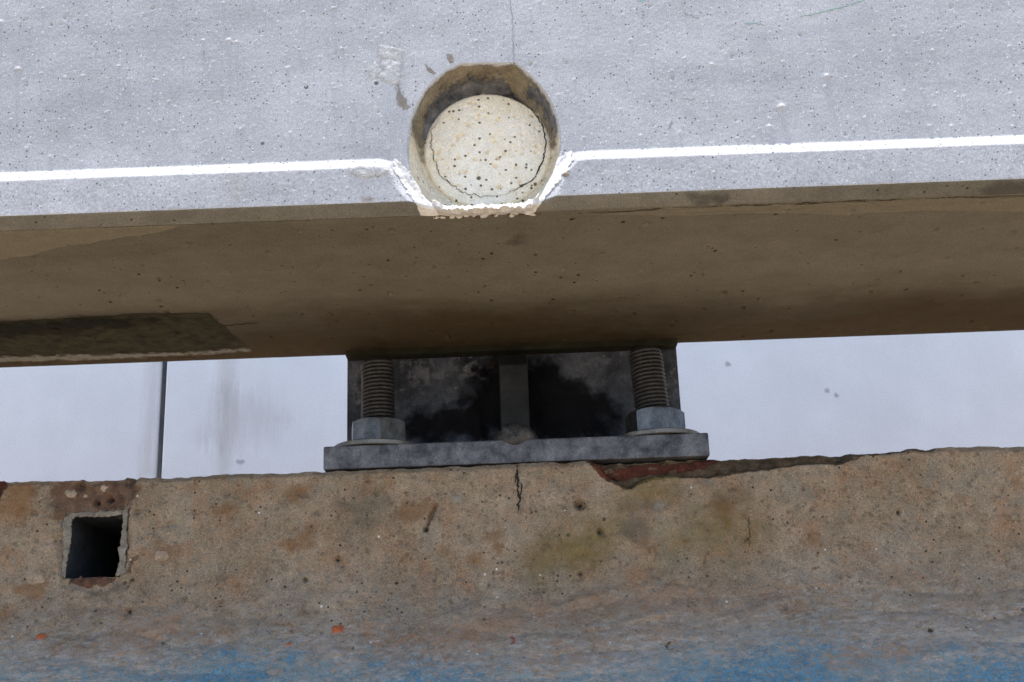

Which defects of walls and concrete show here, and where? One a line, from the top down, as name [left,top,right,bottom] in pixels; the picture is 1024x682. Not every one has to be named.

spalling [348,150,574,220]
crack [514,464,523,514]
spalling [584,448,936,490]